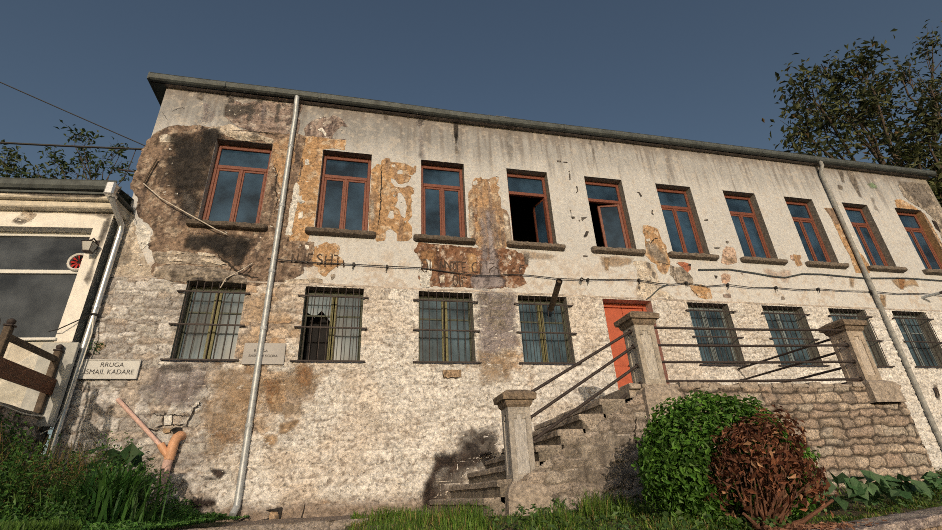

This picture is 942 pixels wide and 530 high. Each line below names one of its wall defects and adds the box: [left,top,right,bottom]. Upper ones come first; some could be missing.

water stain [167,93,303,219]
water stain [232,241,247,265]
peeling [368,158,416,242]
peeling [468,177,512,260]
flaking render [633,210,743,300]
water stain [423,430,496,509]